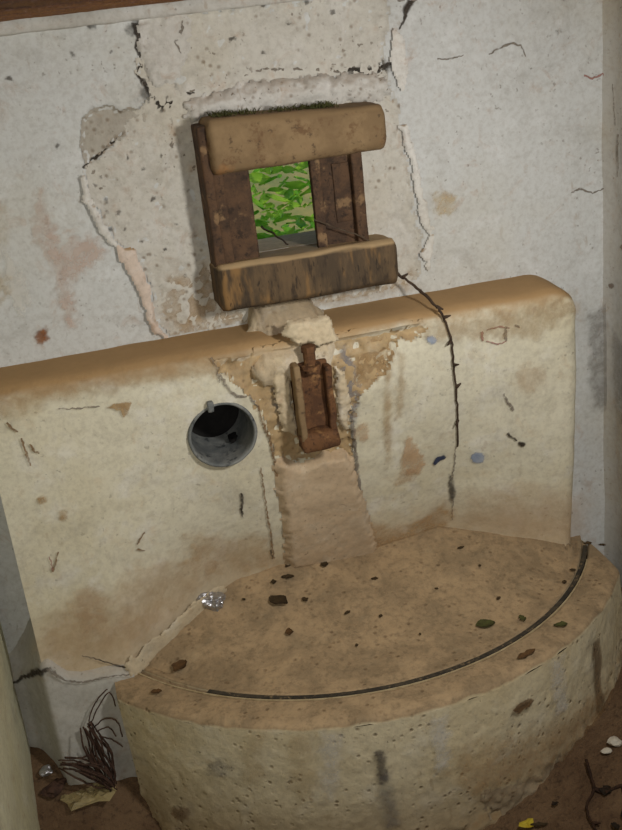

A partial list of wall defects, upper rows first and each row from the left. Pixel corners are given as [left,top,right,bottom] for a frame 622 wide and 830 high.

crack [397,0,416,30]
crack [132,23,195,110]
crack [244,61,391,76]
spalling [79,0,435,461]
crack [13,656,130,684]